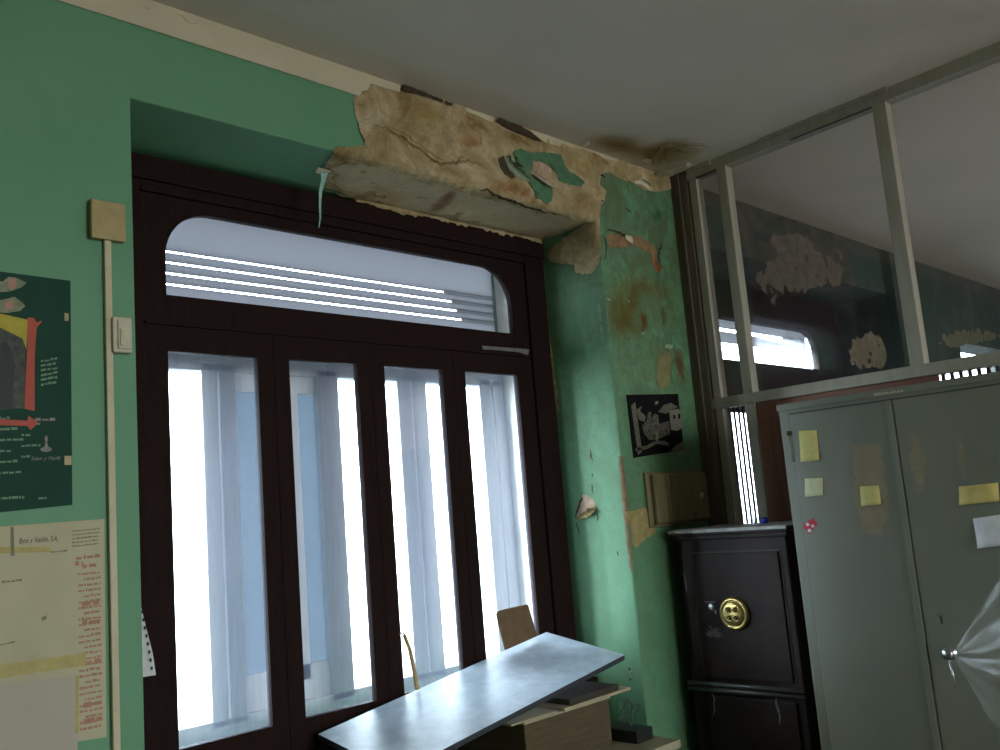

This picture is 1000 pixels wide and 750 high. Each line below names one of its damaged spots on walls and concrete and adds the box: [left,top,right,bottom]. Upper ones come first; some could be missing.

flaking render [316,85,671,275]
flaking render [755,230,846,307]
flaking render [849,331,887,370]
flaking render [939,328,1000,349]
spalling [625,507,656,548]